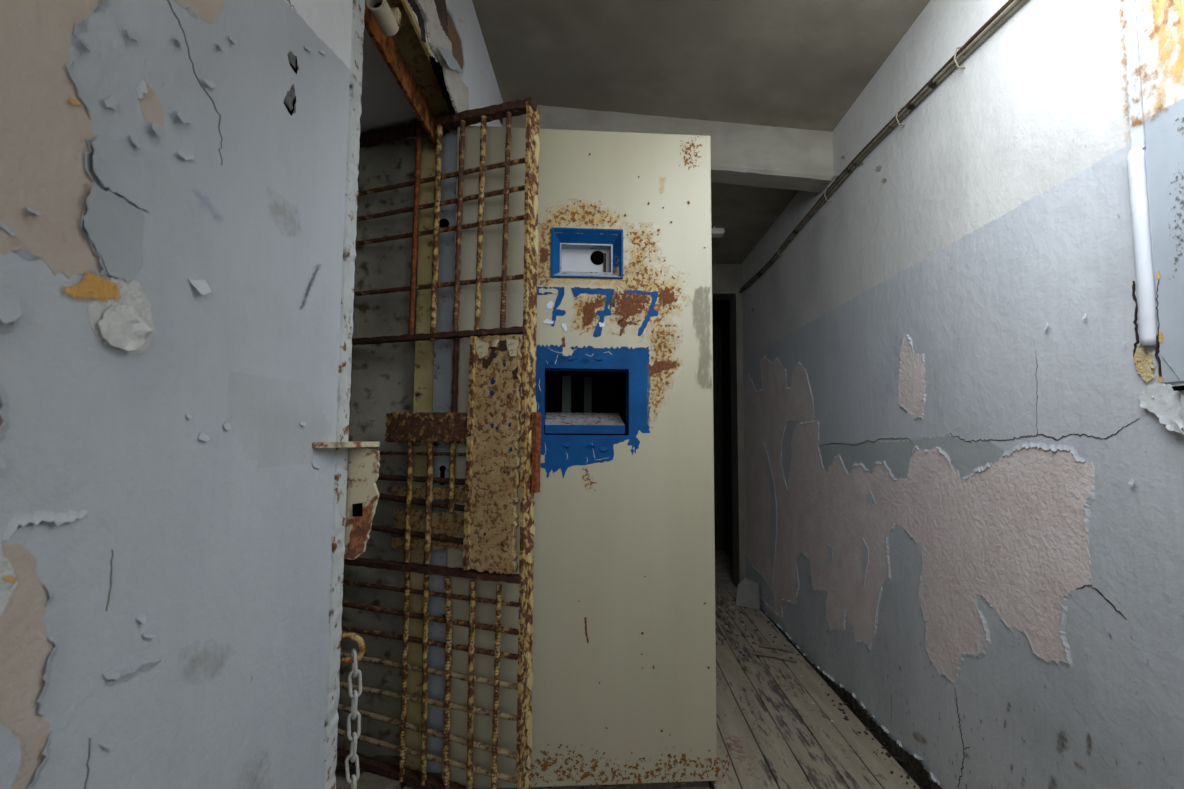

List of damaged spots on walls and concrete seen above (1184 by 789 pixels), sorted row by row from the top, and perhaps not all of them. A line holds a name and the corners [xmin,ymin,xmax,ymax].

crack [167,0,223,165]
corrosion [1119,0,1184,126]
peeling [0,0,156,355]
corrosion [538,199,690,428]
peeling [0,383,10,442]
crack [819,437,913,446]
peeling [897,334,926,421]
crack [950,358,1140,443]
corrosion [346,495,378,560]
peeling [743,355,1095,789]
peeling [0,510,87,789]
corrosion [531,730,730,789]